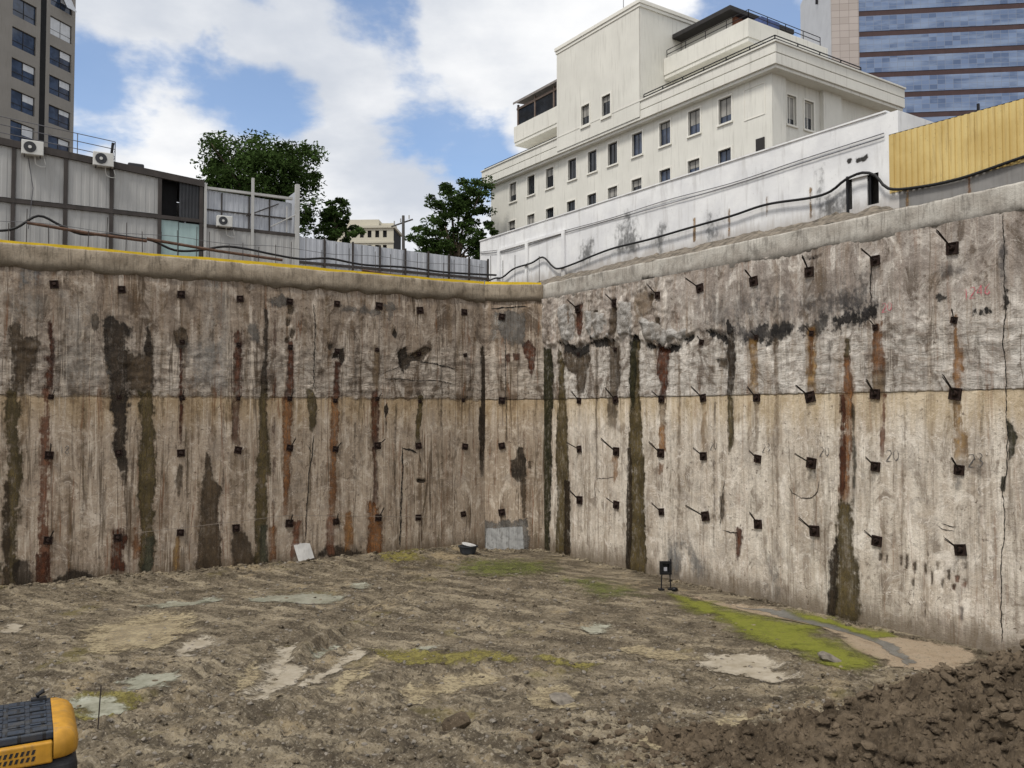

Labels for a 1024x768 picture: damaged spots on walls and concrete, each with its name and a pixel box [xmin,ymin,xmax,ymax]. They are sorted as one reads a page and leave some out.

rust [35,320,55,583]
damp [91,313,157,573]
damp [196,308,276,570]
rust [326,361,354,555]
rust [366,345,383,553]
rust [505,340,536,375]
damp [543,341,592,556]
damp [607,340,648,573]
damp [725,304,876,452]
rust [827,338,862,622]
rust [953,401,968,455]
crack [1000,216,1018,638]